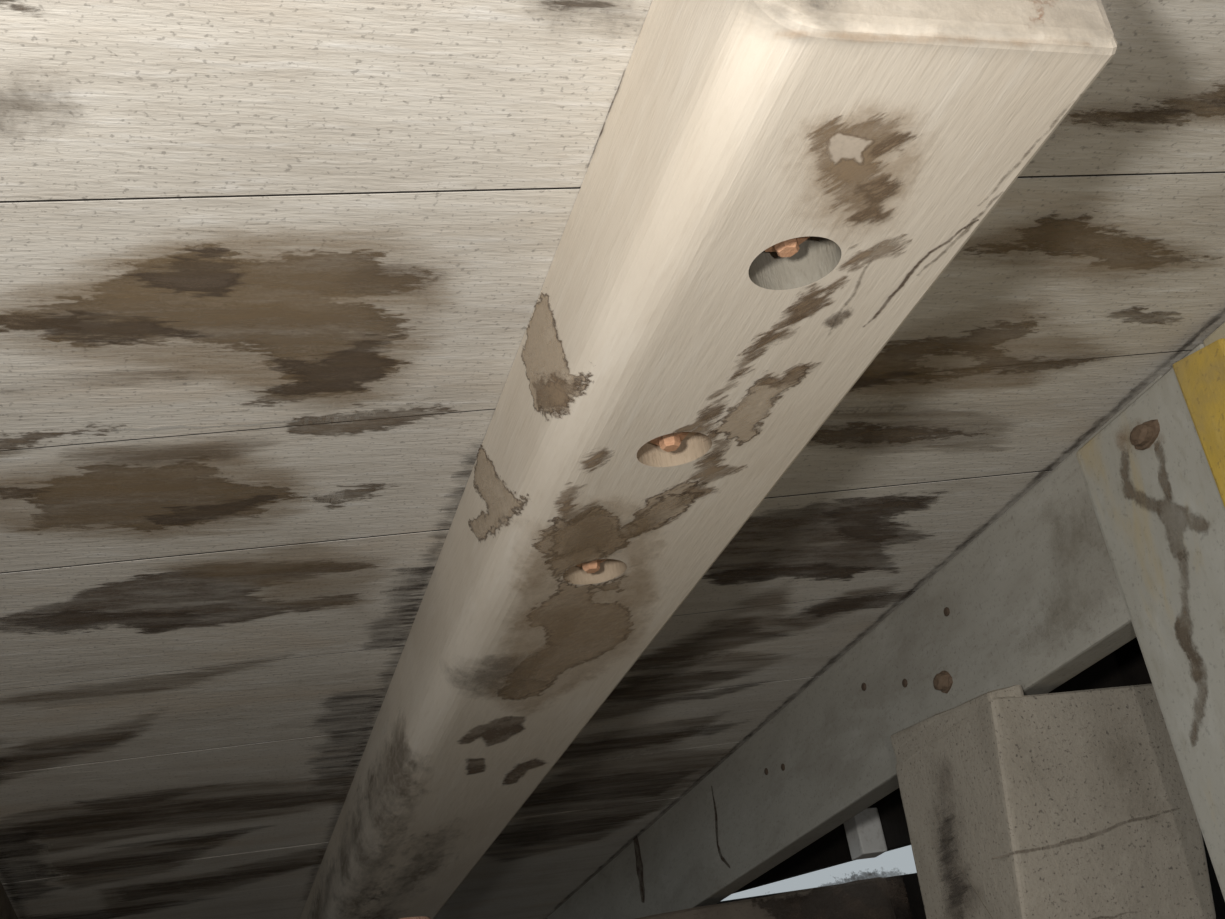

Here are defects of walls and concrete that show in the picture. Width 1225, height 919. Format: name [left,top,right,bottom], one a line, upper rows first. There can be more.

water stain [1068,84,1225,126]
crack [873,212,983,319]
water stain [965,211,1221,272]
water stain [0,244,457,436]
water stain [850,317,1099,393]
water stain [0,422,270,449]
water stain [810,411,984,449]
water stain [0,447,397,535]
water stain [0,562,375,634]
water stain [590,491,948,720]